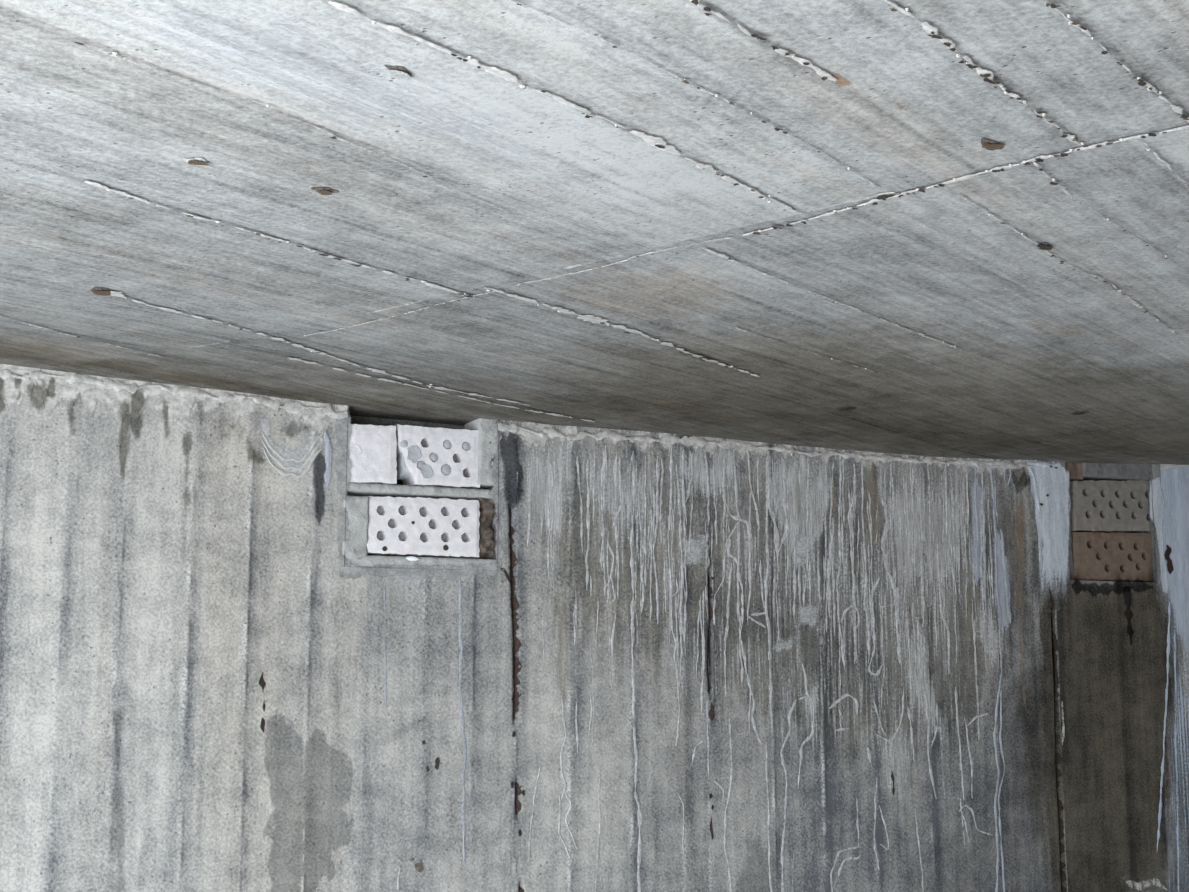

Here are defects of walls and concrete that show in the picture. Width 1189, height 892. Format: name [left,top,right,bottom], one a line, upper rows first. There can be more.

water stain [498,420,1070,892]
water stain [1126,464,1189,892]